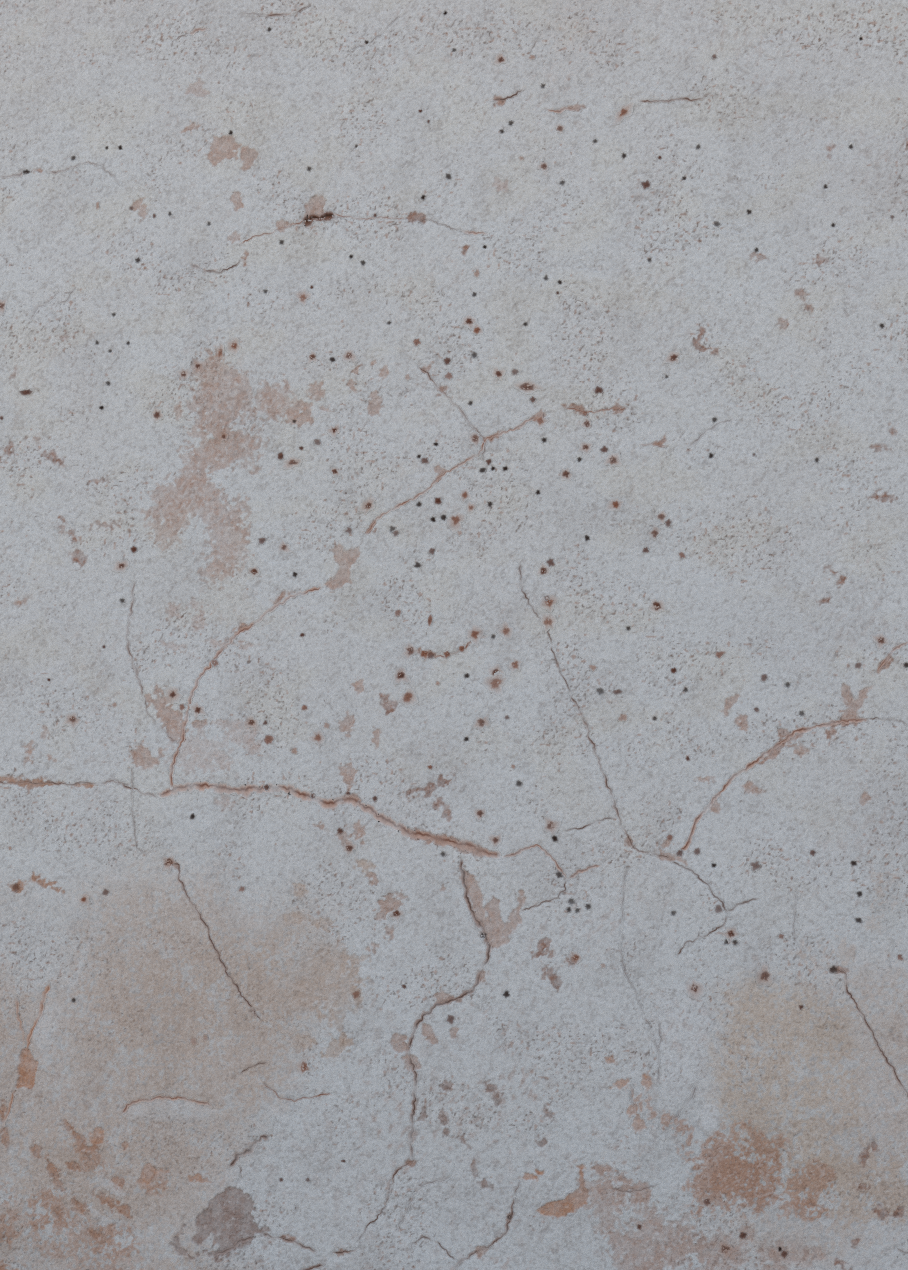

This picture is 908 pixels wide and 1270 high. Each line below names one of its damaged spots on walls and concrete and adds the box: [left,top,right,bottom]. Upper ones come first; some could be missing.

peeling [173,118,260,172]
crack [362,358,632,535]
crack [639,418,736,449]
crack [0,561,908,1270]
spalling [27,1118,272,1265]
damp [0,822,359,1270]
peeling [414,1077,495,1193]
peeling [481,1079,508,1110]
peeling [533,1102,554,1150]
peeling [535,1160,861,1270]
damp [665,805,908,1270]
peeling [852,1140,906,1223]